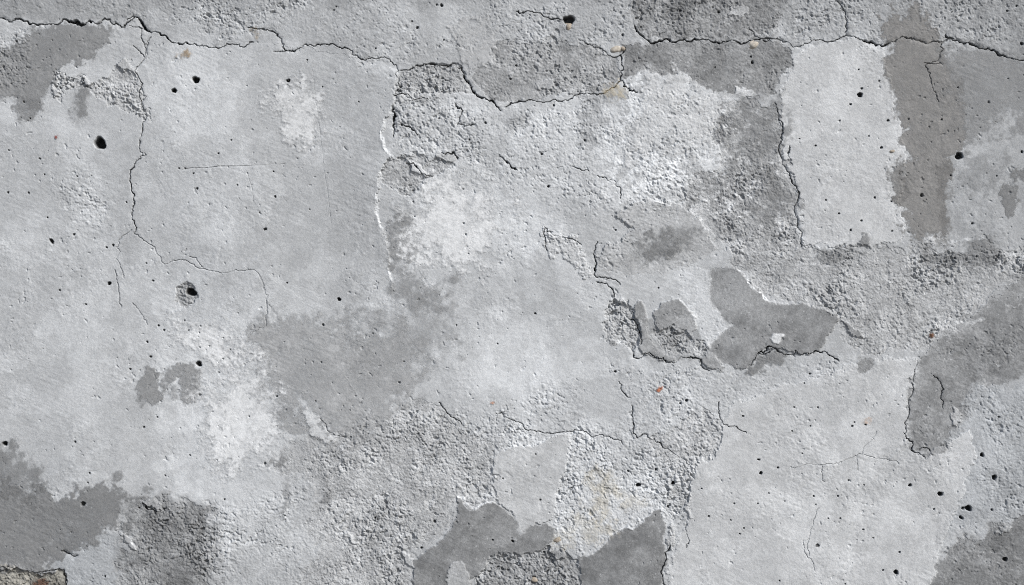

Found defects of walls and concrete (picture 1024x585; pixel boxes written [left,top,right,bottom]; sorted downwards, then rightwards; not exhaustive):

crack [940,34,1024,62]
spalling [381,152,457,197]
crack [0,1,896,334]
spalling [393,0,1024,457]
crack [496,382,690,466]
crack [793,362,945,482]